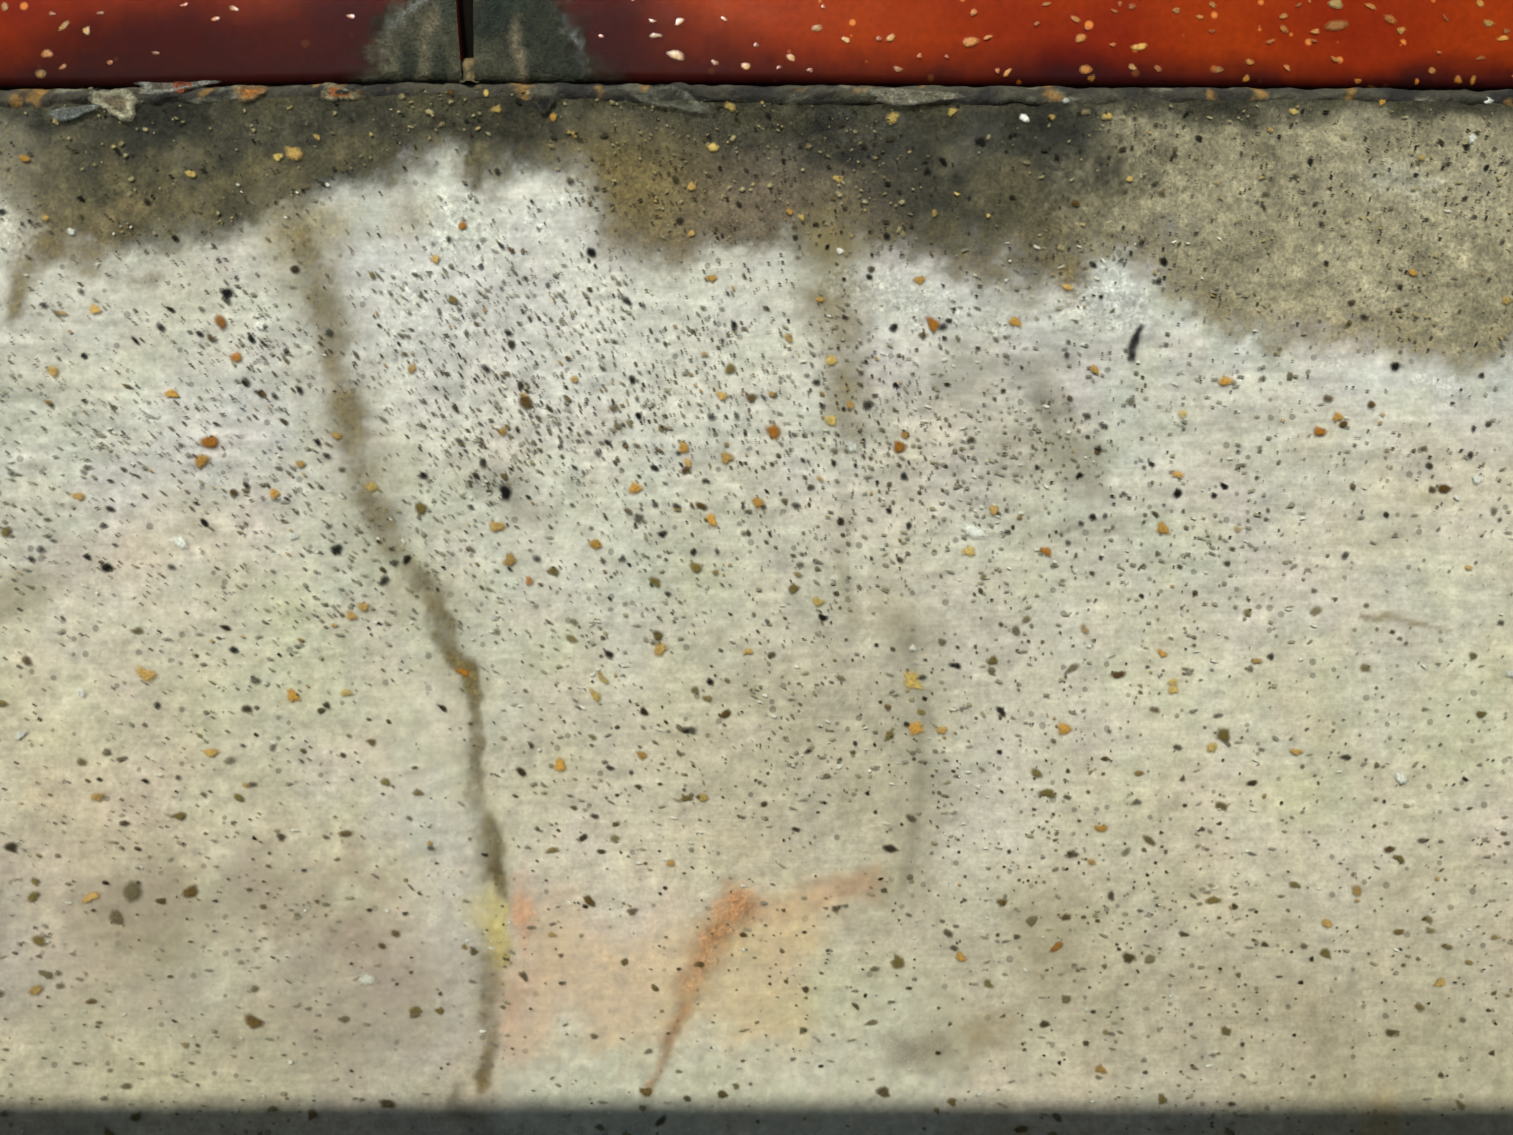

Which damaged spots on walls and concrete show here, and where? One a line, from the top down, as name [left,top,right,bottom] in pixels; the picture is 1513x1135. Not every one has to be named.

water stain [0,0,1513,372]
crack [291,231,362,443]
crack [428,595,502,889]
rust [687,890,752,989]
crack [476,1040,492,1090]